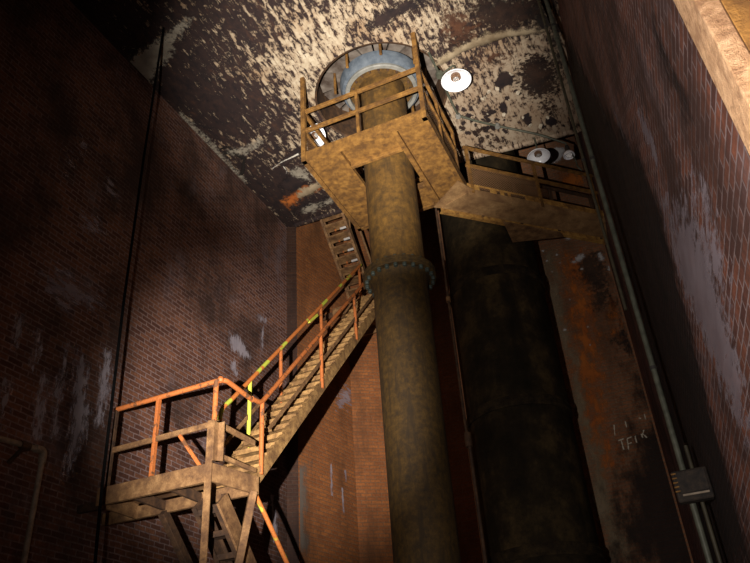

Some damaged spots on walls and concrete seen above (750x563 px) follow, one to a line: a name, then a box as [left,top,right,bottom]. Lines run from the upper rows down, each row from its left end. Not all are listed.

peeling [365,0,428,31]
peeling [441,0,545,50]
peeling [459,48,563,150]
peeling [273,146,304,193]
corrosion [281,186,307,205]
water stain [567,38,750,563]
water stain [230,336,249,376]
water stain [33,349,111,471]